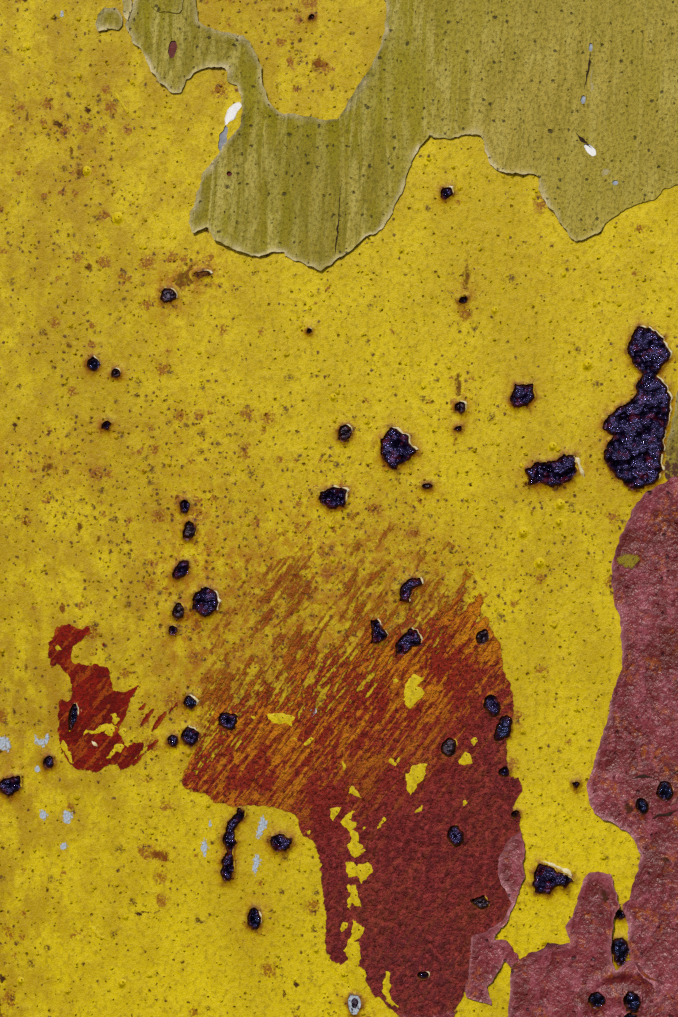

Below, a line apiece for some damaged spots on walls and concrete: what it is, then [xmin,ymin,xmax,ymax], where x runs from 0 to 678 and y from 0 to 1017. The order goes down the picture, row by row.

peeling [122,0,678,271]
spalling [161,287,177,303]
peeling [34,326,678,1017]